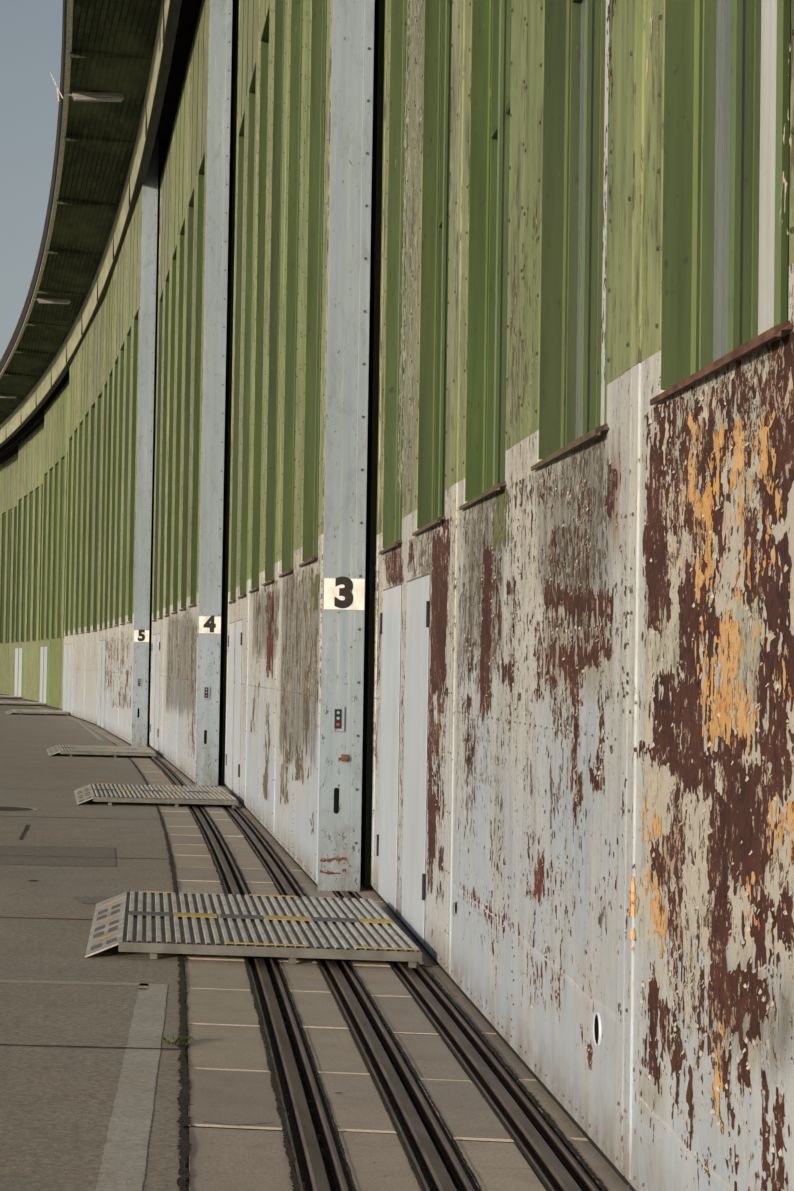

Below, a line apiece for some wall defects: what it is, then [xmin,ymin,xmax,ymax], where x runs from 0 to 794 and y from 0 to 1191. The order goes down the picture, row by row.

peeling [382,539,414,599]
peeling [425,331,794,1191]